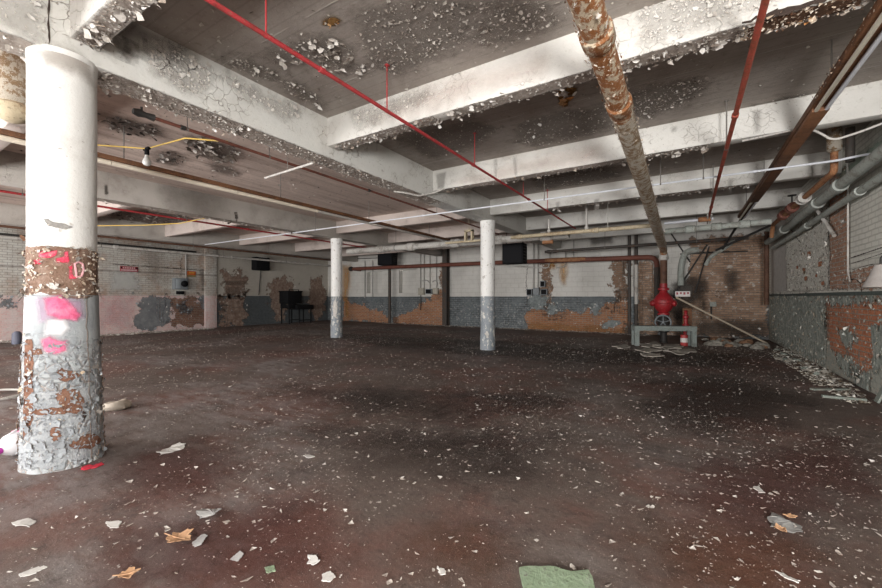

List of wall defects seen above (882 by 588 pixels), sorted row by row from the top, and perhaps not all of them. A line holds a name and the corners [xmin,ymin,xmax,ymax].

peeling [64,0,166,51]
peeling [97,0,871,250]
peeling [0,235,105,309]
peeling [132,292,204,332]
peeling [217,267,250,327]
peeling [265,274,296,322]
peeling [307,262,442,331]
peeling [524,260,683,336]
peeling [673,189,882,392]
peeling [15,334,109,471]